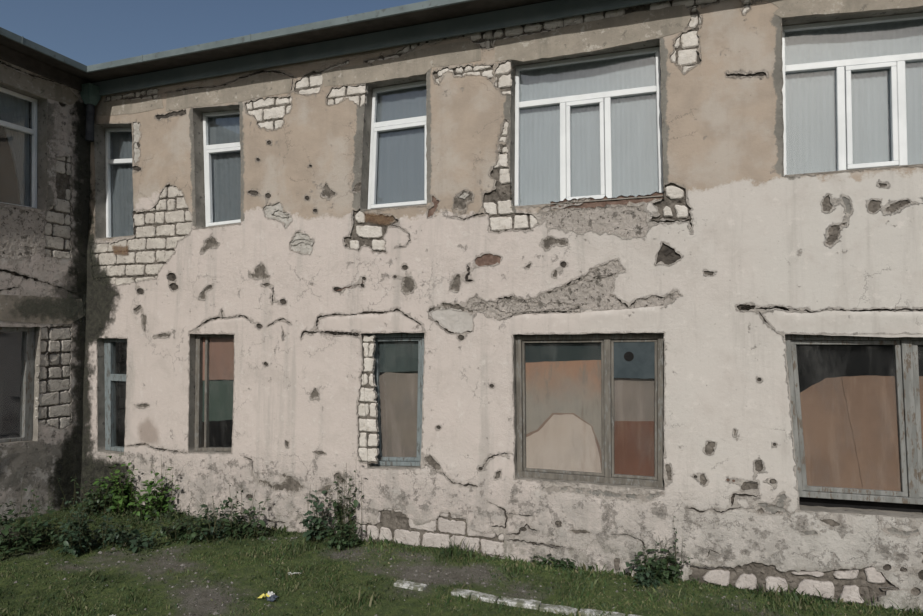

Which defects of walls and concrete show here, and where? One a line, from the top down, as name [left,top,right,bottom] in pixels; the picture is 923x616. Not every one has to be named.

flaking render [245,60,368,144]
peeling [453,119,692,251]
flaking render [94,183,192,294]
flaking render [344,208,398,253]
crack [0,269,78,295]
damp [12,294,86,321]
crack [190,280,421,338]
spalling [428,260,680,340]
crack [737,304,923,329]
flaking render [357,335,379,464]
flaking render [359,508,505,558]
flaking render [686,552,923,605]